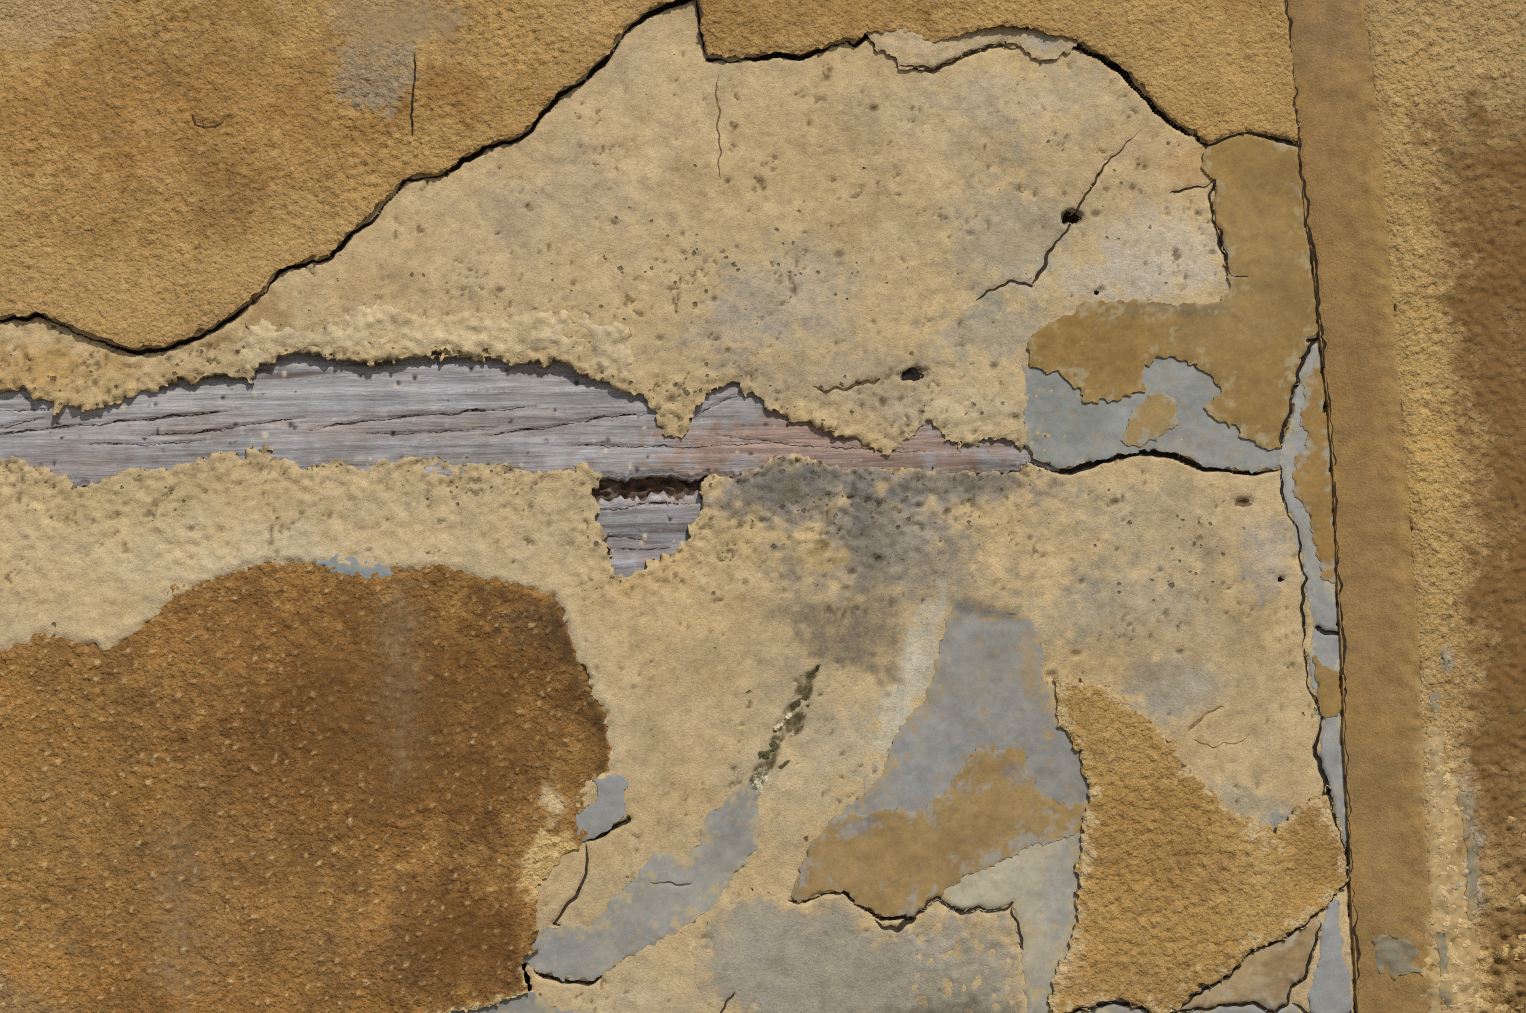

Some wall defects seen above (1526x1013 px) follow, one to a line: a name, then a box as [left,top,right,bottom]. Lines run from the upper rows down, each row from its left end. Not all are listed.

crack [192,115,224,128]
crack [409,54,417,136]
crack [714,76,722,178]
crack [895,44,1019,73]
spalling [0,0,1231,456]
crack [976,128,1143,300]
crack [813,378,880,393]
crack [1071,0,1361,1013]
spalling [0,334,1355,1013]
crack [875,896,1024,950]